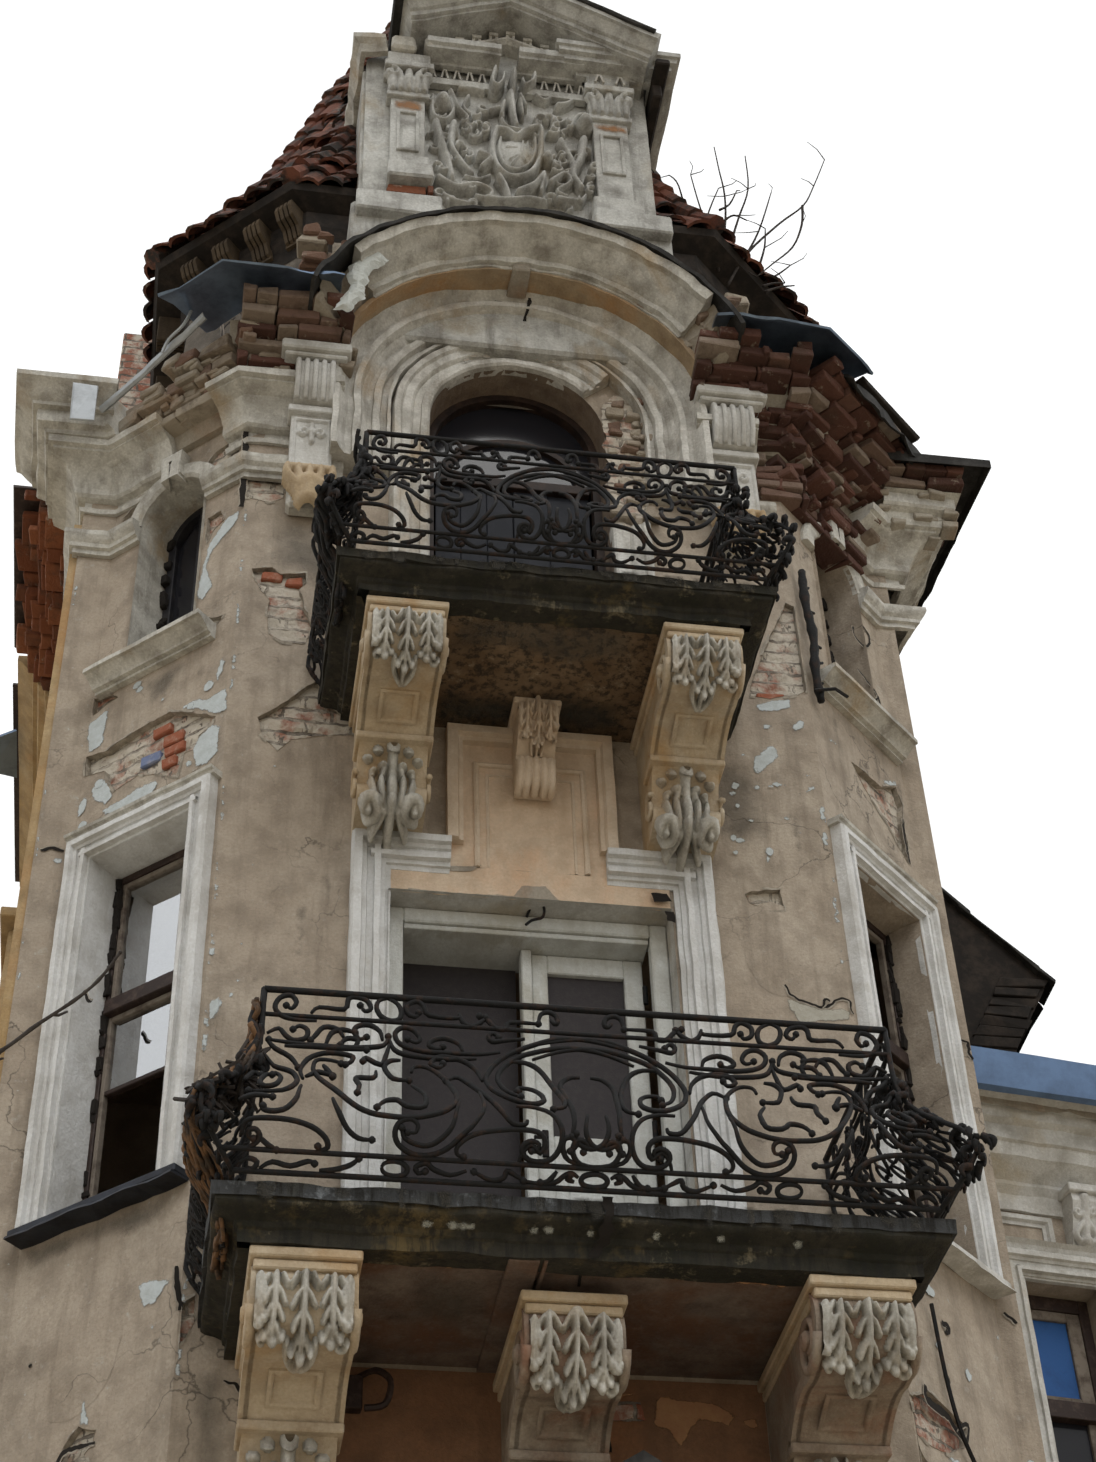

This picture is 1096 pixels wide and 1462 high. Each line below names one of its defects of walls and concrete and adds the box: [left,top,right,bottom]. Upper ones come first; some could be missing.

flaking render [197,480,286,599]
flaking render [208,605,239,625]
flaking render [239,560,311,645]
flaking render [78,655,236,828]
flaking render [258,682,354,767]
peeling [202,980,239,1051]
crack [783,984,854,1014]
flaking render [61,1403,96,1462]
peeling [613,1394,758,1446]